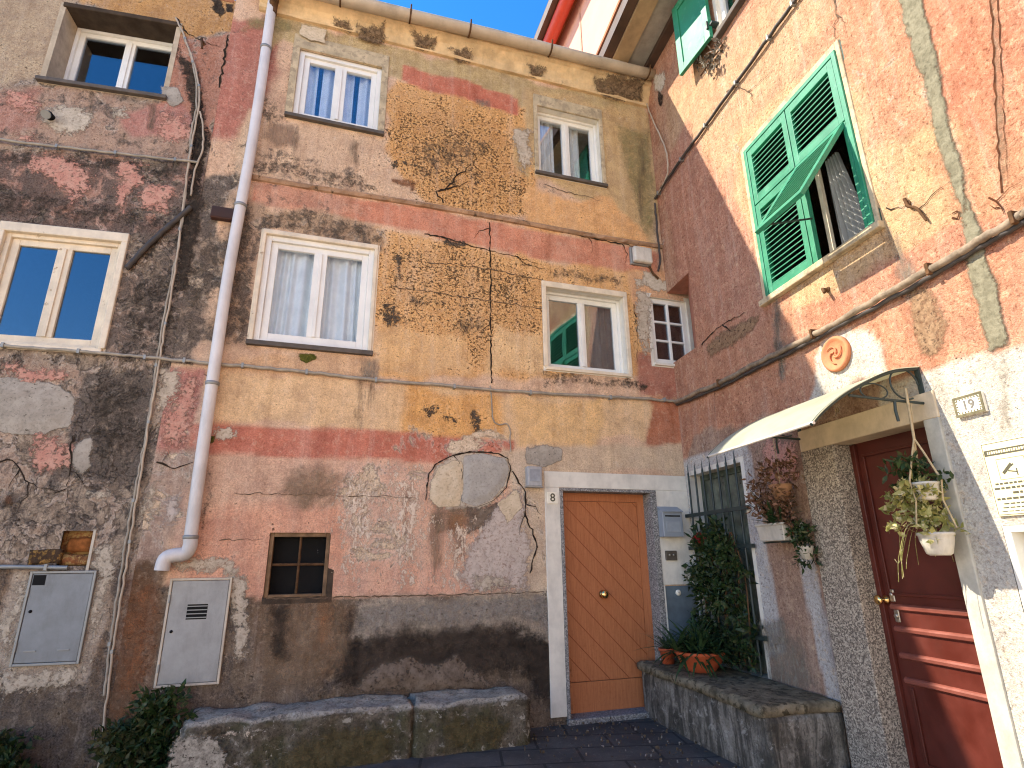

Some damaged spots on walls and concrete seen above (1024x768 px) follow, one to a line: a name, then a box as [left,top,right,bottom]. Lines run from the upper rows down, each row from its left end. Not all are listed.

crack [176,17,229,88]
damp [3,151,169,177]
crack [436,164,471,203]
peeling [513,128,533,172]
mould [0,185,138,229]
crack [562,232,637,257]
crack [389,222,542,383]
crack [0,436,88,511]
crack [235,451,544,600]
spalling [27,530,97,571]
damp [263,604,550,701]